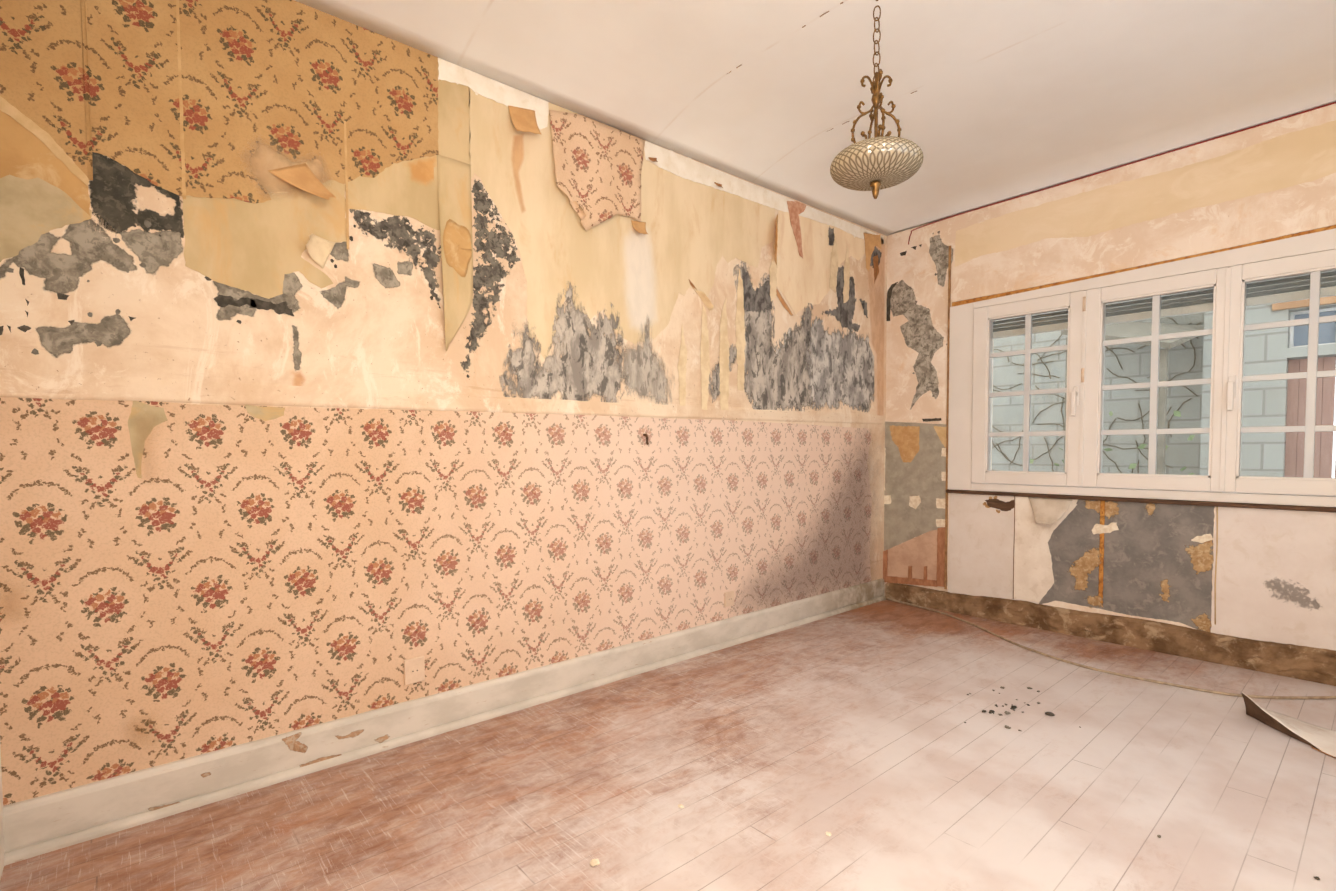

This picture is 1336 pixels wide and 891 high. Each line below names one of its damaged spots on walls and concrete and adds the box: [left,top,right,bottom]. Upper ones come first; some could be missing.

flaking render [0,152,184,358]
flaking render [204,273,302,370]
flaking render [321,209,441,309]
flaking render [460,180,520,378]
flaking render [499,141,884,412]
flaking render [890,280,947,463]
flaking render [900,231,953,287]
peeling [948,493,1336,651]
peeling [282,729,389,767]